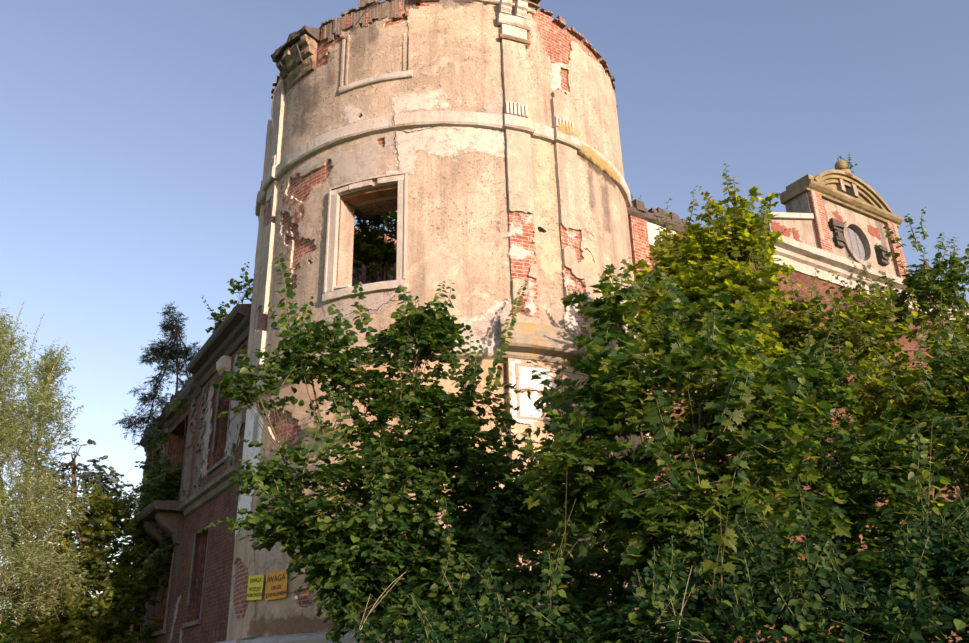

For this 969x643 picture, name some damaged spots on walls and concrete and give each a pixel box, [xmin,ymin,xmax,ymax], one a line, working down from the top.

spalling [308,15,408,74]
spalling [532,10,571,91]
crack [393,109,461,168]
peeling [263,126,506,290]
spalling [458,139,597,341]
peeling [199,378,214,488]
peeling [224,400,307,621]